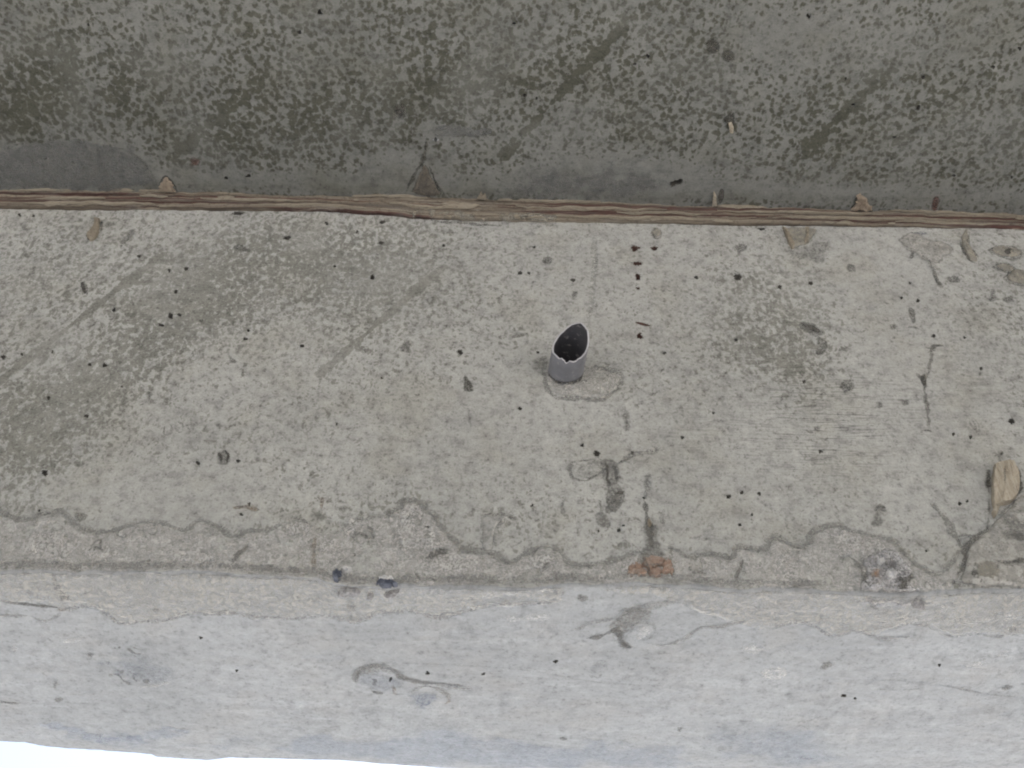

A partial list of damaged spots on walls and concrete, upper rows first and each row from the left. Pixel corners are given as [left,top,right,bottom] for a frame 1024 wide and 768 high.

crack [917,344,941,432]
crack [637,475,664,555]
crack [931,500,1024,577]